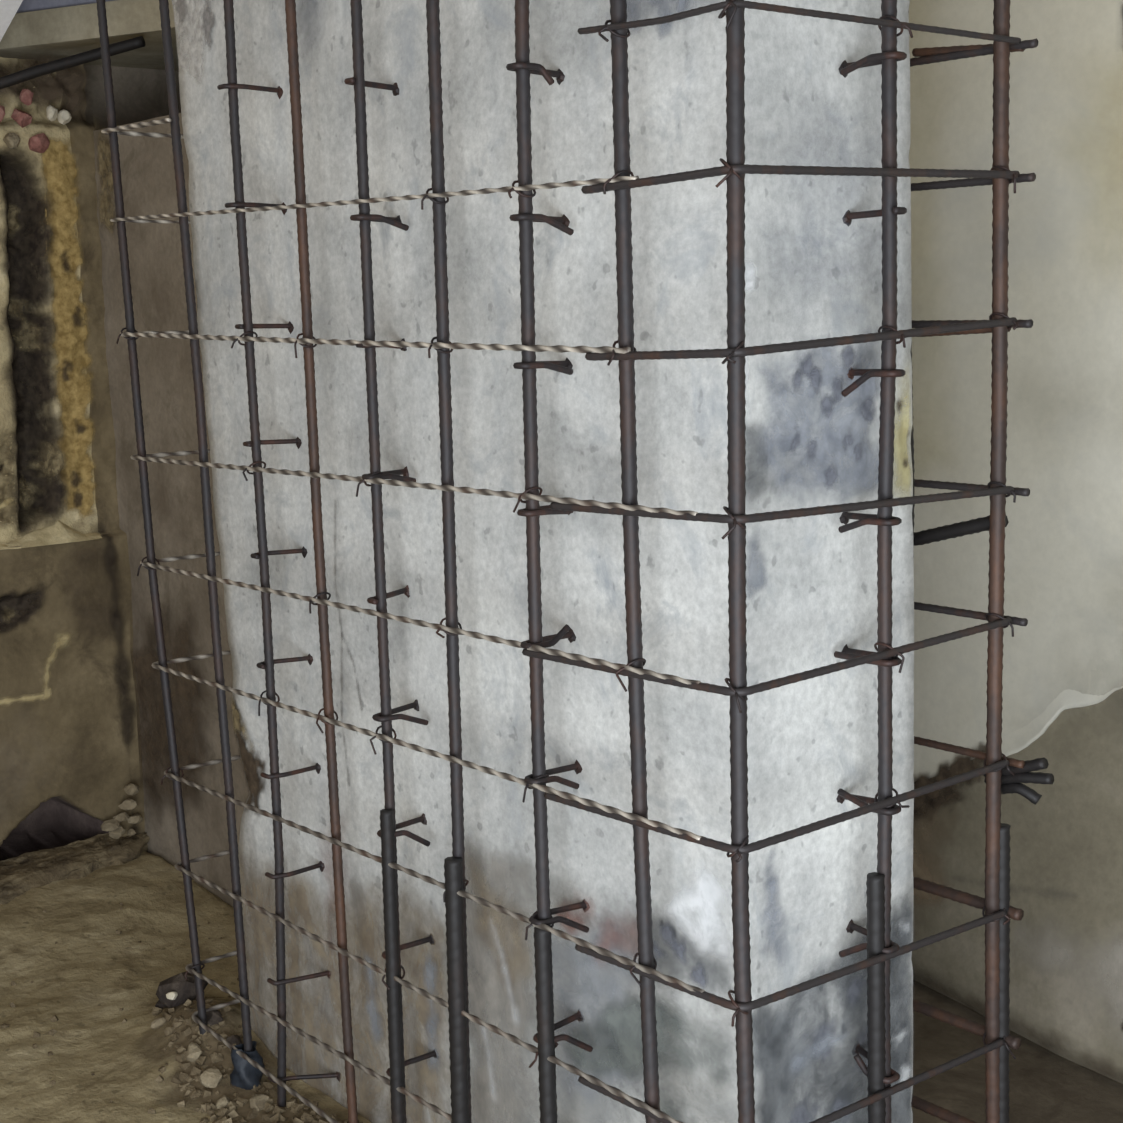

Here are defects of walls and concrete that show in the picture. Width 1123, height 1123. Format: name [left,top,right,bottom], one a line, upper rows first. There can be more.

flaking render [0,139,96,533]
damp [747,346,879,490]
damp [752,935,868,1123]
damp [890,811,942,1123]